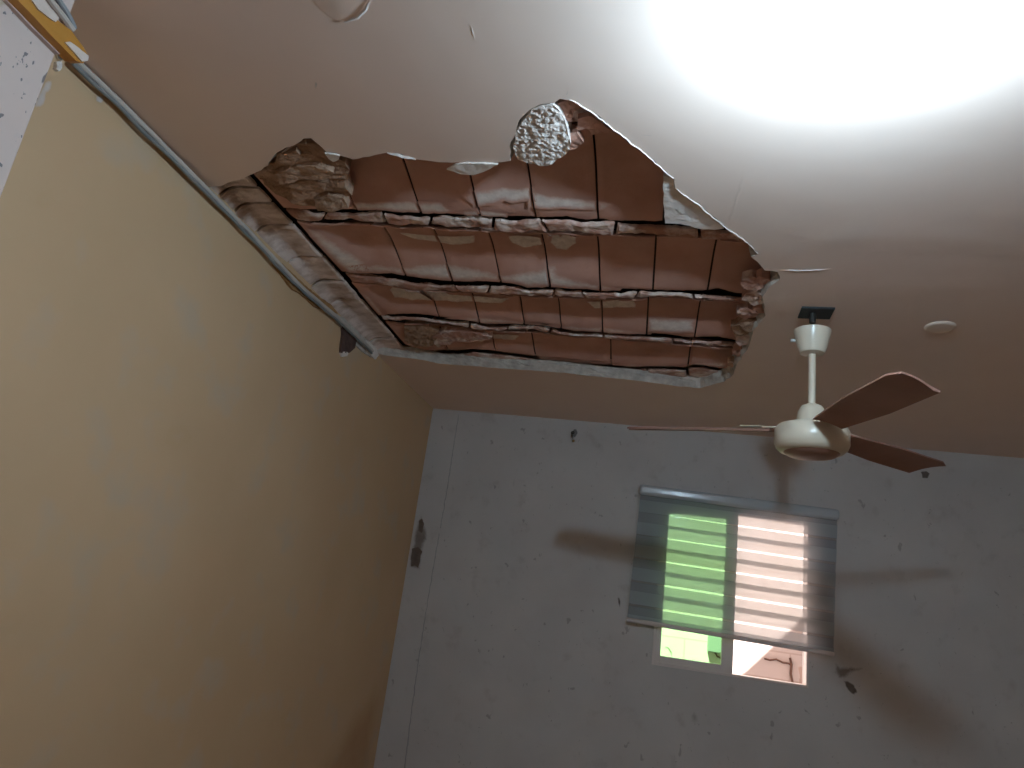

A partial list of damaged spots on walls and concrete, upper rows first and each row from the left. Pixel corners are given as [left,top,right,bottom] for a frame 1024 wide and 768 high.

spalling [209,99,780,388]
peeling [408,514,428,572]